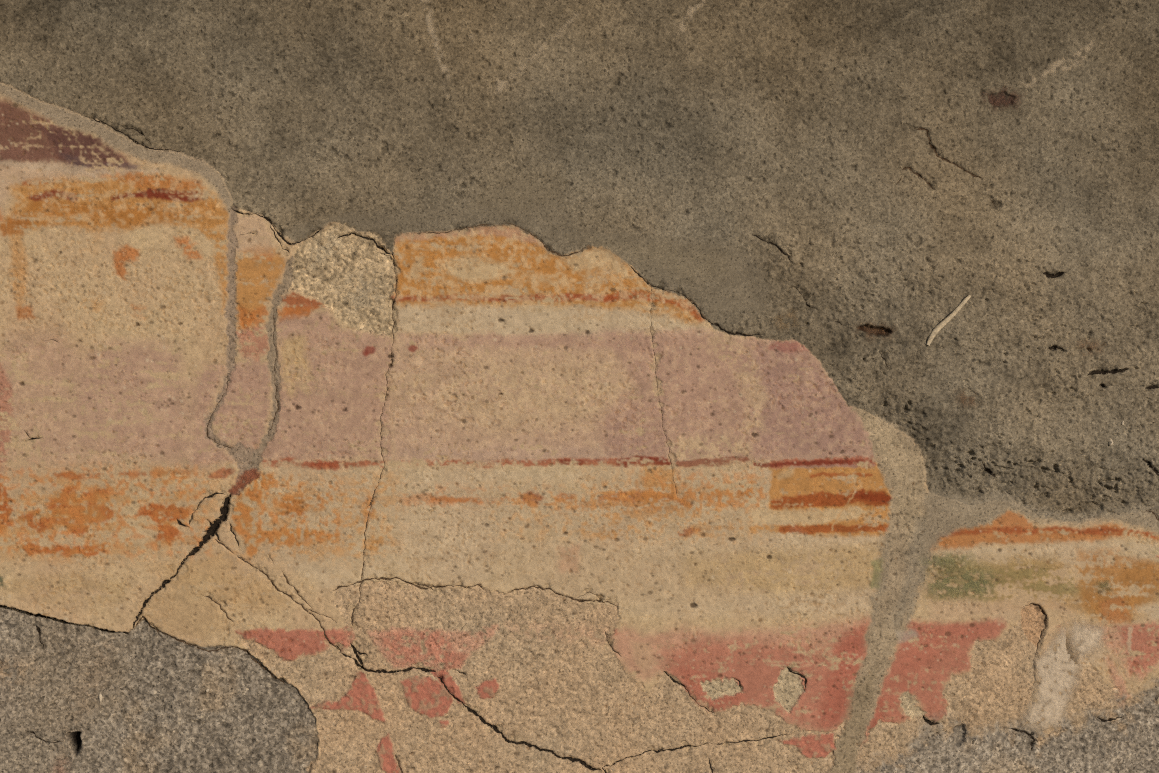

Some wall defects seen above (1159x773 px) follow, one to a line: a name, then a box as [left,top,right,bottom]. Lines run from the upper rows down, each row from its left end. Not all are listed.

crack [896,128,996,207]
flaking render [291,223,399,337]
crack [1087,368,1159,390]
crack [0,208,790,773]
crack [982,461,1012,495]
flaking render [879,387,1159,522]
crack [1143,459,1159,476]
crack [787,667,807,693]
peeling [856,613,1048,773]
peeling [1060,666,1159,732]